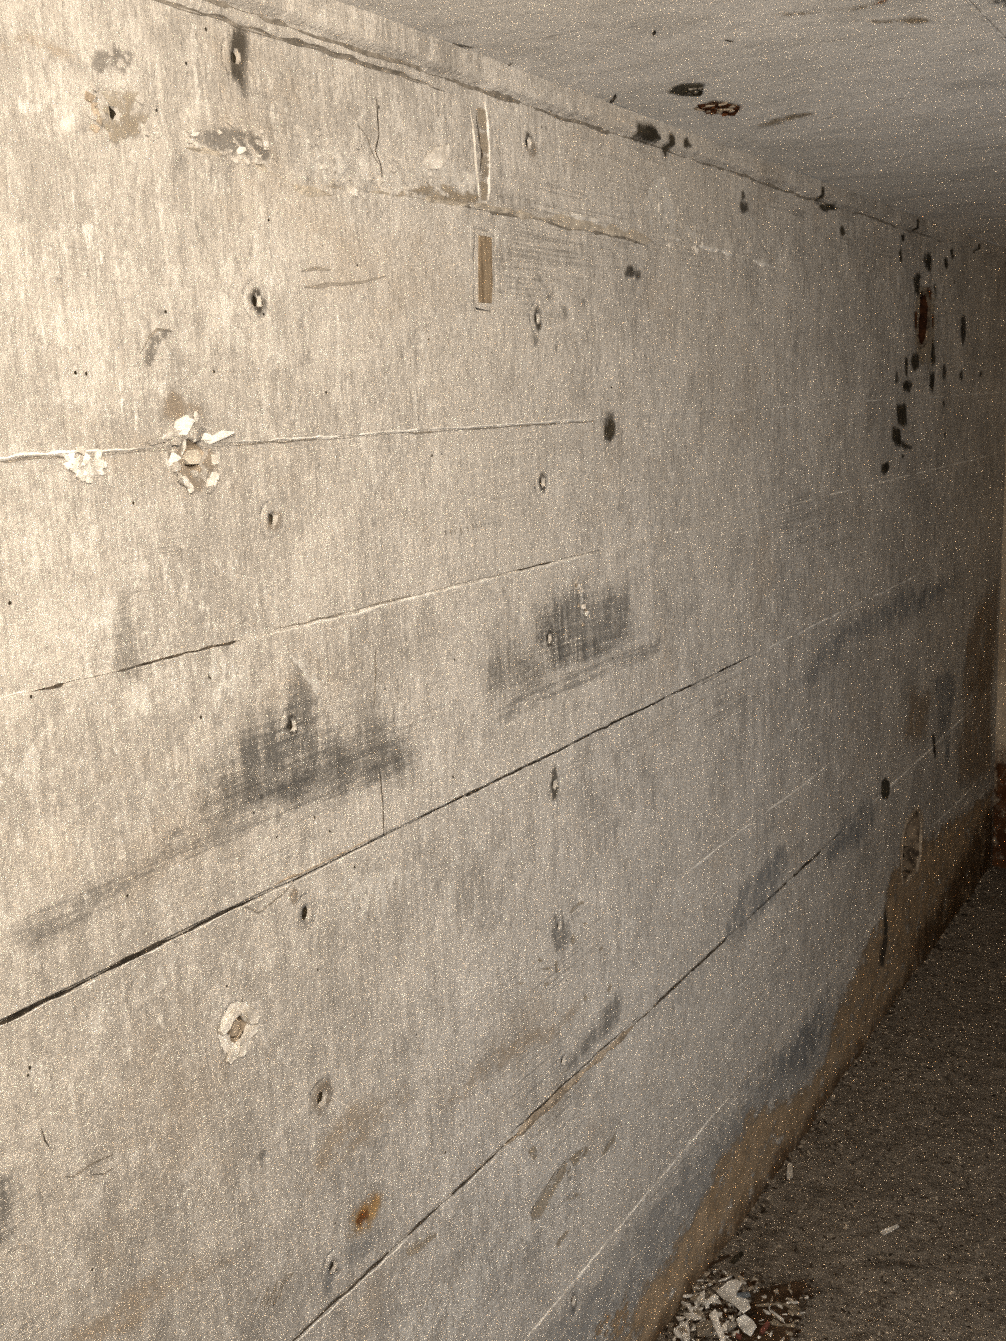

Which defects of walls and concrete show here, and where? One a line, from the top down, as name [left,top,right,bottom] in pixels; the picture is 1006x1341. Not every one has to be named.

spalling [78,48,162,152]
peeling [179,119,279,172]
flaking render [62,446,107,483]
spalling [145,394,235,494]
damp [908,589,997,779]
damp [829,778,890,856]
spalling [218,998,260,1064]
damp [545,791,993,1341]
rust [353,1194,380,1231]